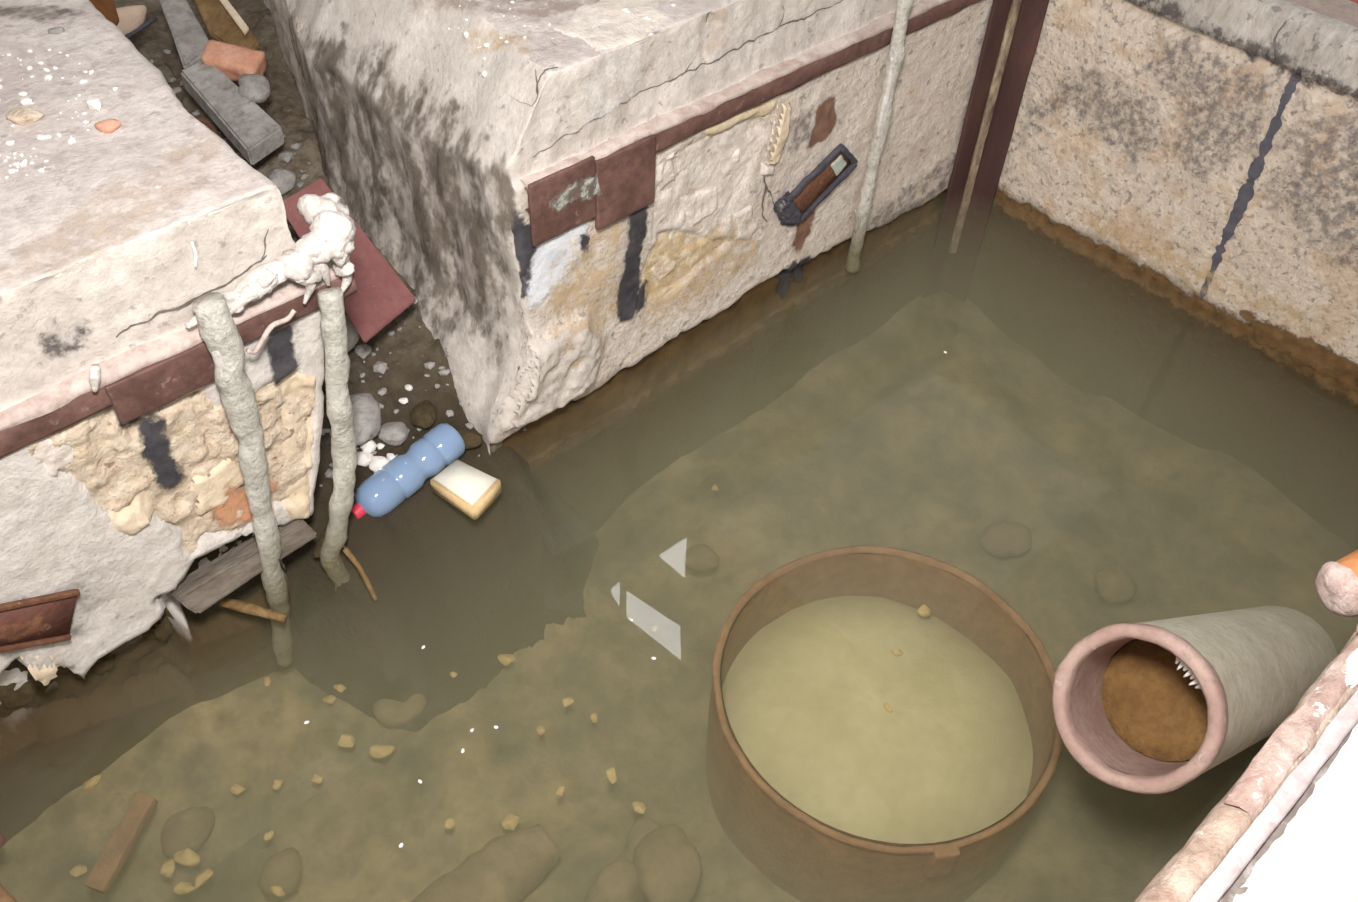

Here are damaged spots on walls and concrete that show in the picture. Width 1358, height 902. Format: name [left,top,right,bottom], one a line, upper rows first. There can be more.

water stain [221,16,515,350]
peeling [527,223,590,310]
rust [790,96,836,148]
water stain [993,187,1358,405]
crack [1200,21,1302,300]
spalling [29,388,254,576]
spalling [255,372,316,521]
spalling [0,594,209,718]